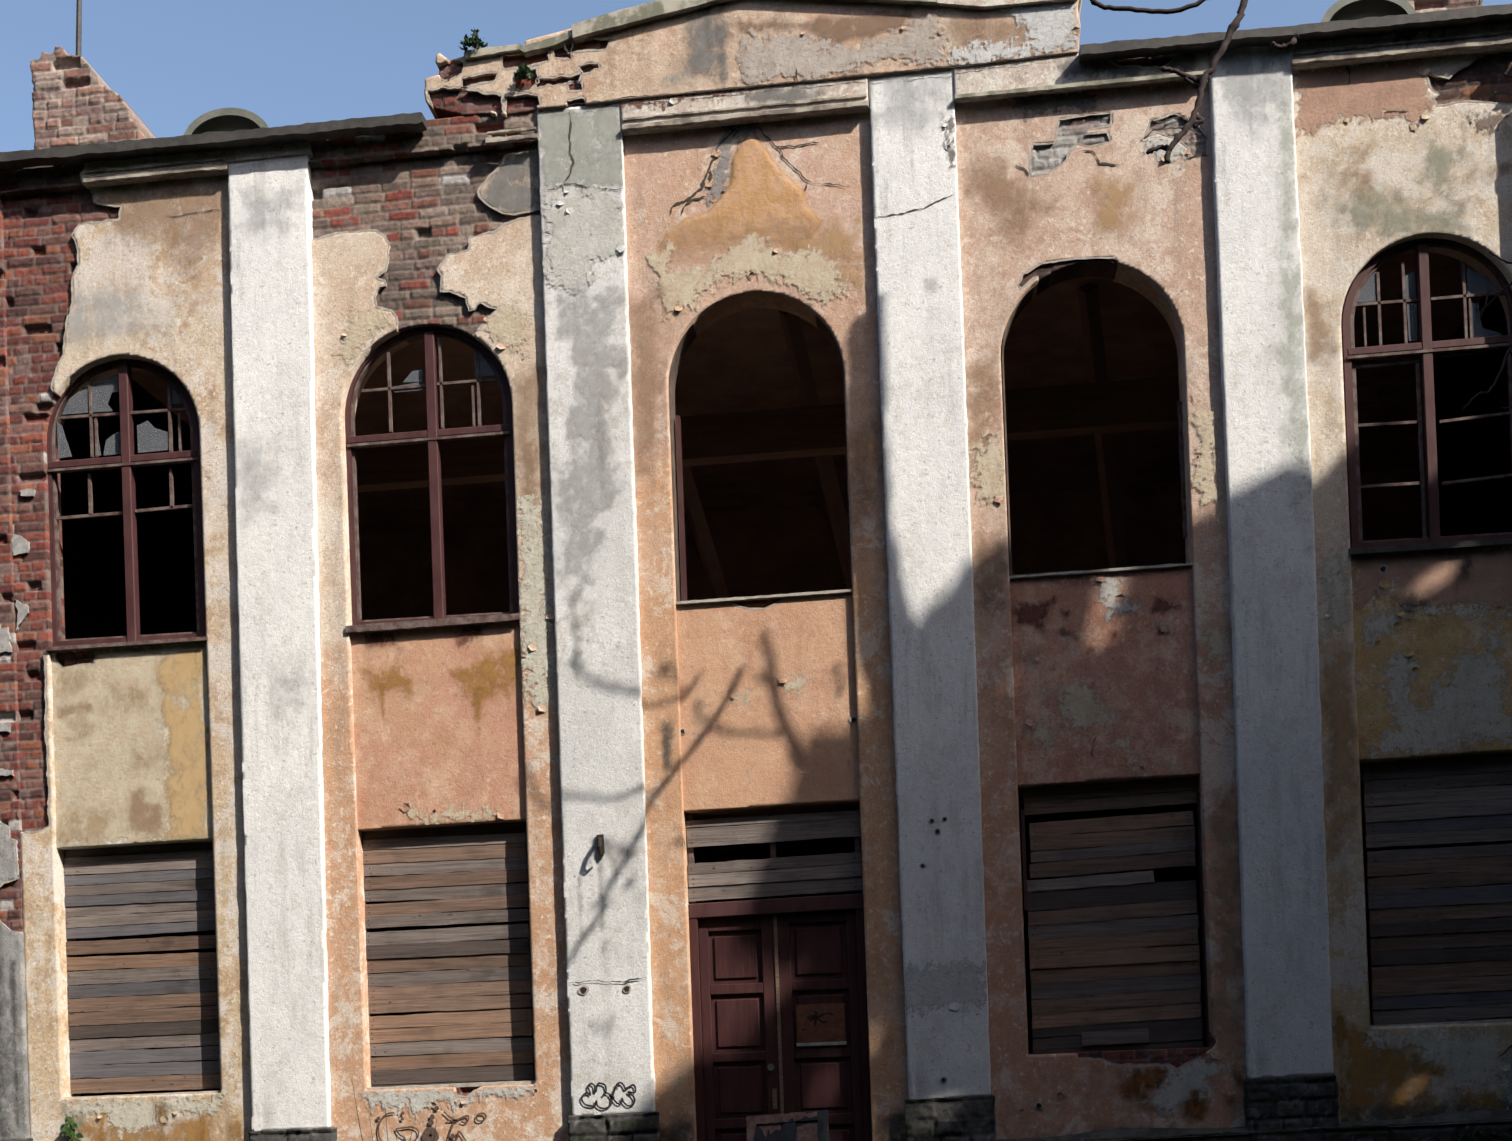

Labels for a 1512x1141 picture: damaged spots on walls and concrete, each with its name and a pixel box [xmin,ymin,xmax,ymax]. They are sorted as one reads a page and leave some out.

flaking render [308,36,626,368]
peeling [703,123,762,206]
crack [538,54,1062,218]
flaking render [1004,90,1112,176]
flaking render [1142,113,1209,168]
peeling [1293,29,1512,145]
peeling [646,232,852,320]
damp [560,289,661,626]
flaking render [0,163,209,932]
peeling [1087,572,1142,626]
peeling [1351,546,1512,759]
damp [131,791,160,831]